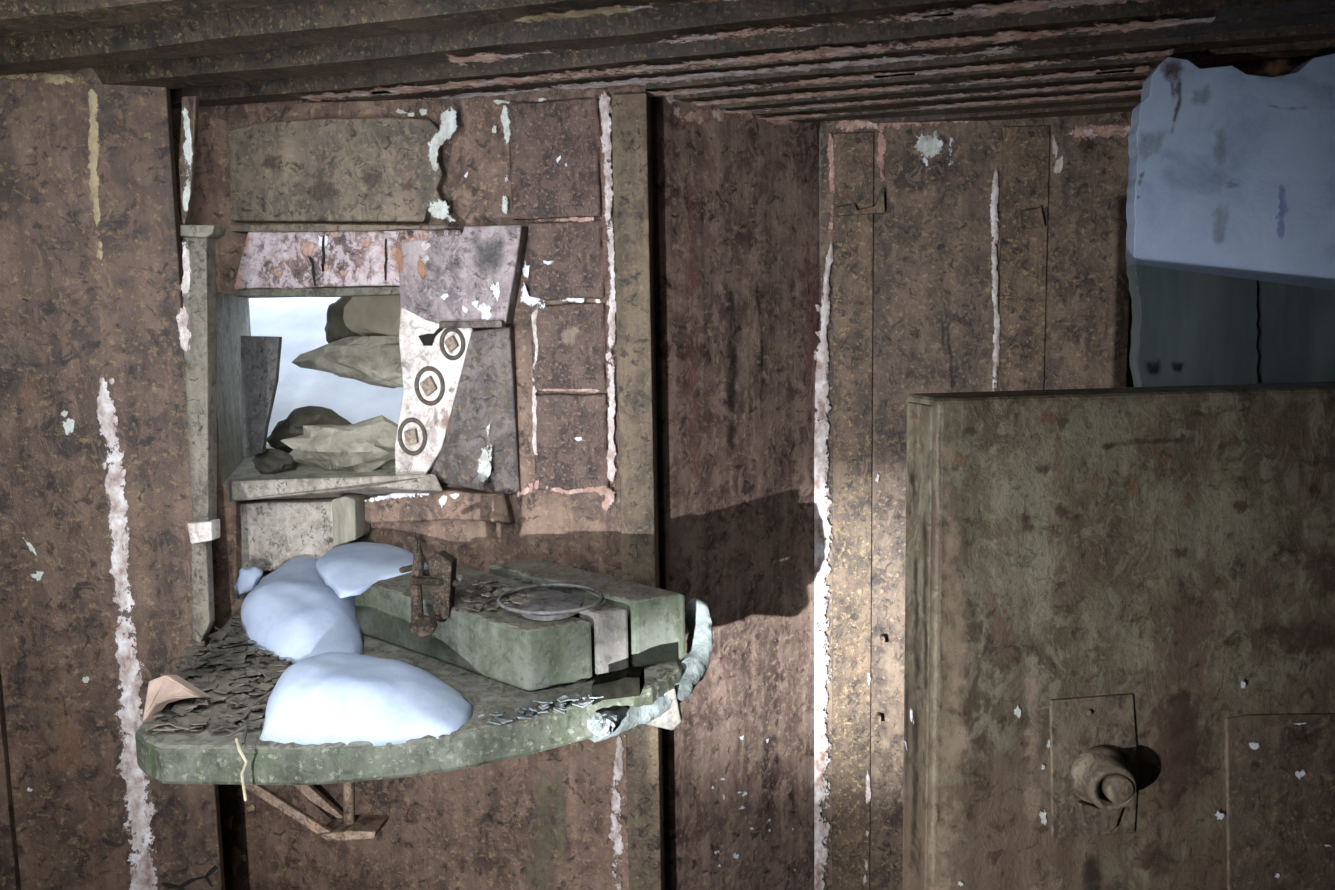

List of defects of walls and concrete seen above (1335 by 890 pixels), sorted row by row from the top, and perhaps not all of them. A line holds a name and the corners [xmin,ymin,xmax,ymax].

peeling [295,17,1216,890]
peeling [657,0,1154,44]